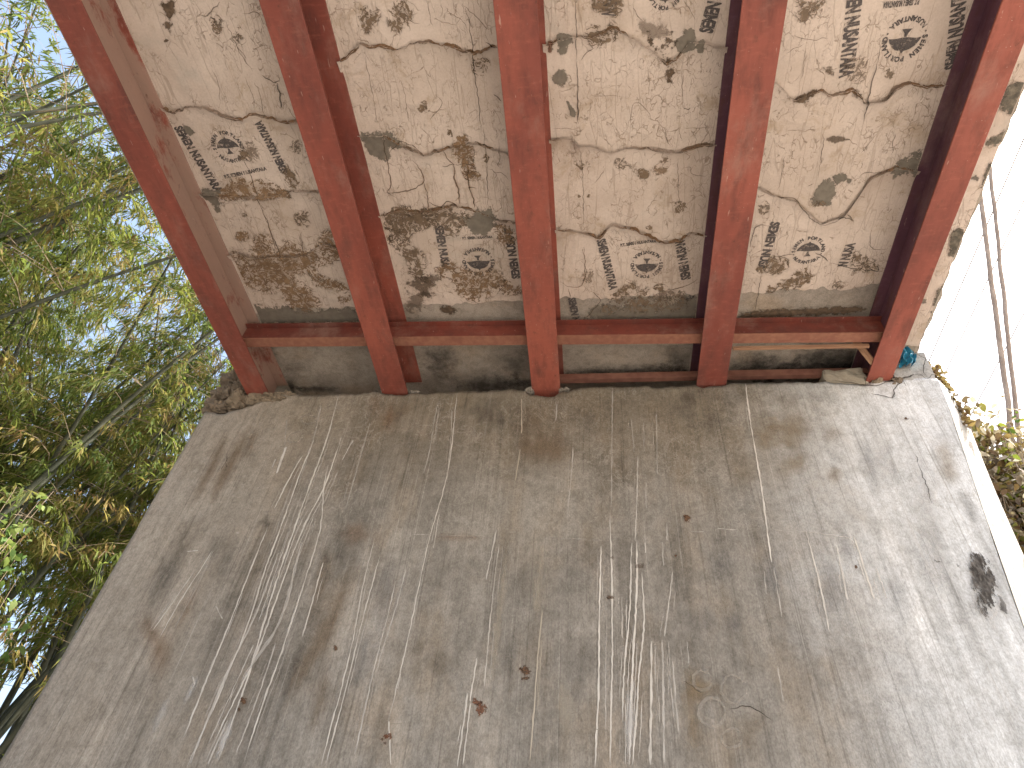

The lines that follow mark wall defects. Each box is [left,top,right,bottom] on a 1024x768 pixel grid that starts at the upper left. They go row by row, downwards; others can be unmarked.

peeling [557,0,623,55]
peeling [646,28,705,83]
crack [366,7,508,210]
crack [556,5,601,224]
crack [861,46,896,175]
peeling [200,164,299,213]
crack [777,141,884,272]
peeling [812,173,851,206]
peeling [231,230,359,323]
peeling [383,206,522,315]
peeling [756,255,814,293]
water stain [472,379,531,434]